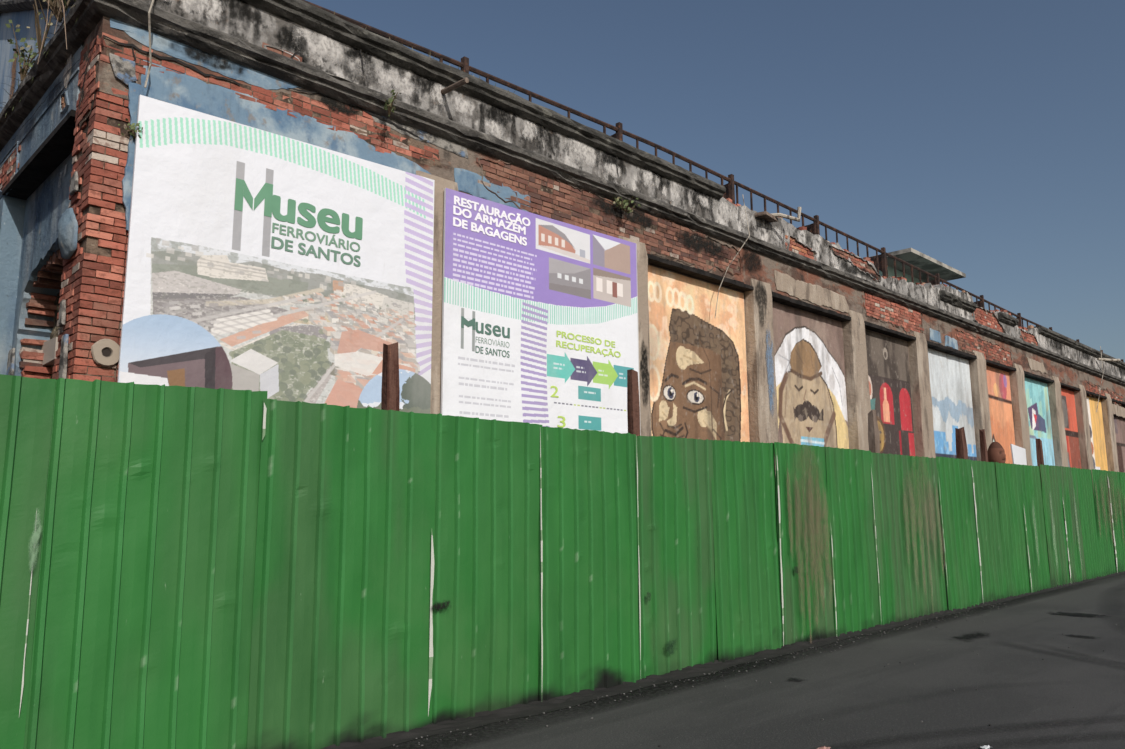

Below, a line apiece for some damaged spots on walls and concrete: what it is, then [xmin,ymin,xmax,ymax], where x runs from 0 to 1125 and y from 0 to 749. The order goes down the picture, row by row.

water stain [186,0,260,39]
water stain [172,44,243,73]
water stain [279,26,624,177]
flaking render [0,140,21,195]
flaking render [52,18,743,382]
water stain [595,197,653,228]
water stain [643,170,753,226]
flaking render [785,226,814,260]
flaking render [828,241,948,288]
peeling [774,270,849,313]
flaking render [862,291,1013,367]
peeling [1026,357,1047,374]